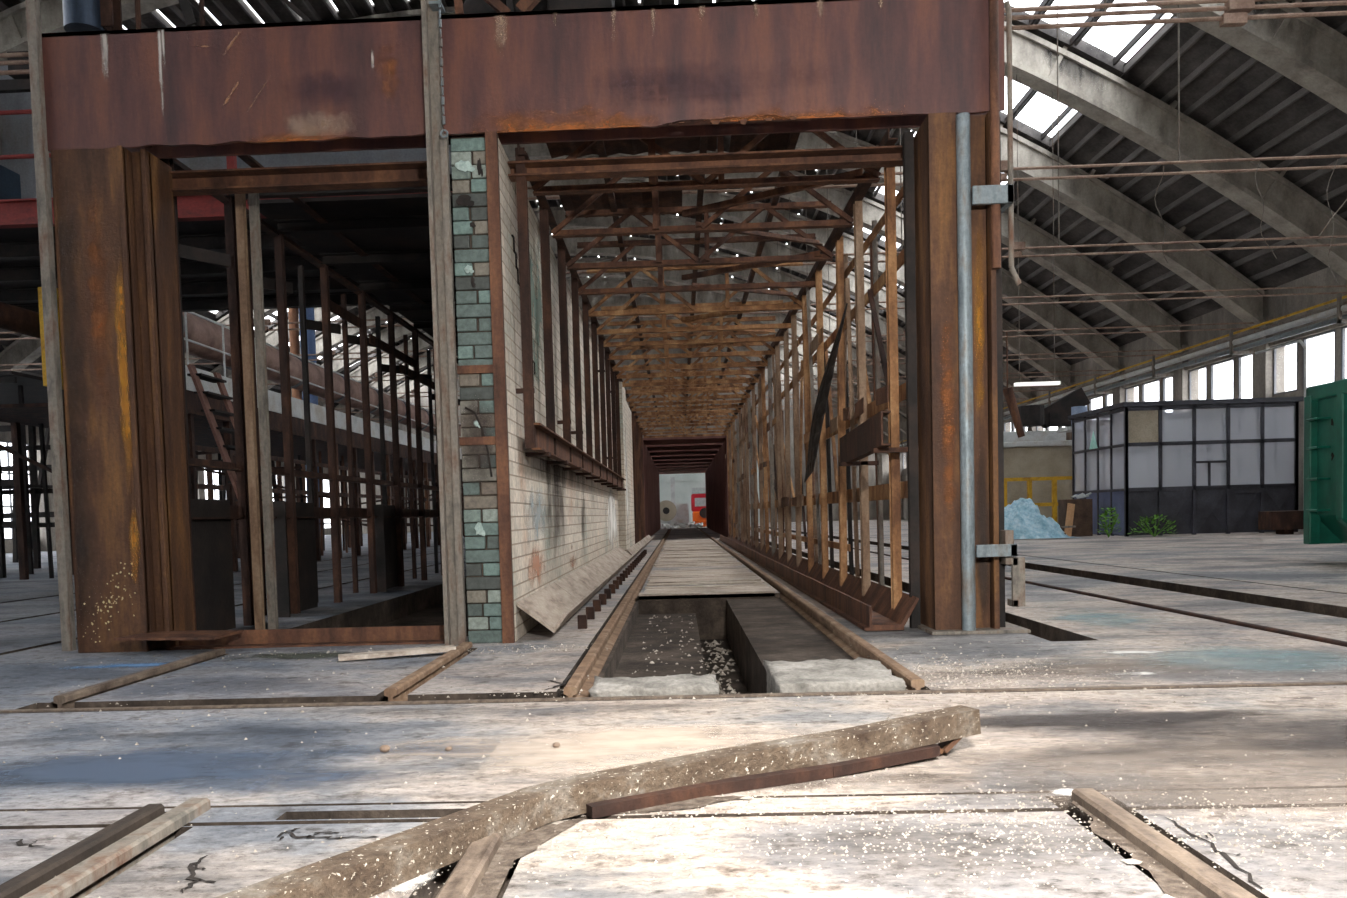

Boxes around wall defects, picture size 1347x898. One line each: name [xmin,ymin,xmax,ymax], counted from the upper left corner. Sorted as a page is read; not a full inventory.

corrosion [501,110,638,132]
corrosion [662,110,882,126]
corrosion [256,131,325,143]
corrosion [92,282,131,451]
crack [1165,817,1264,889]